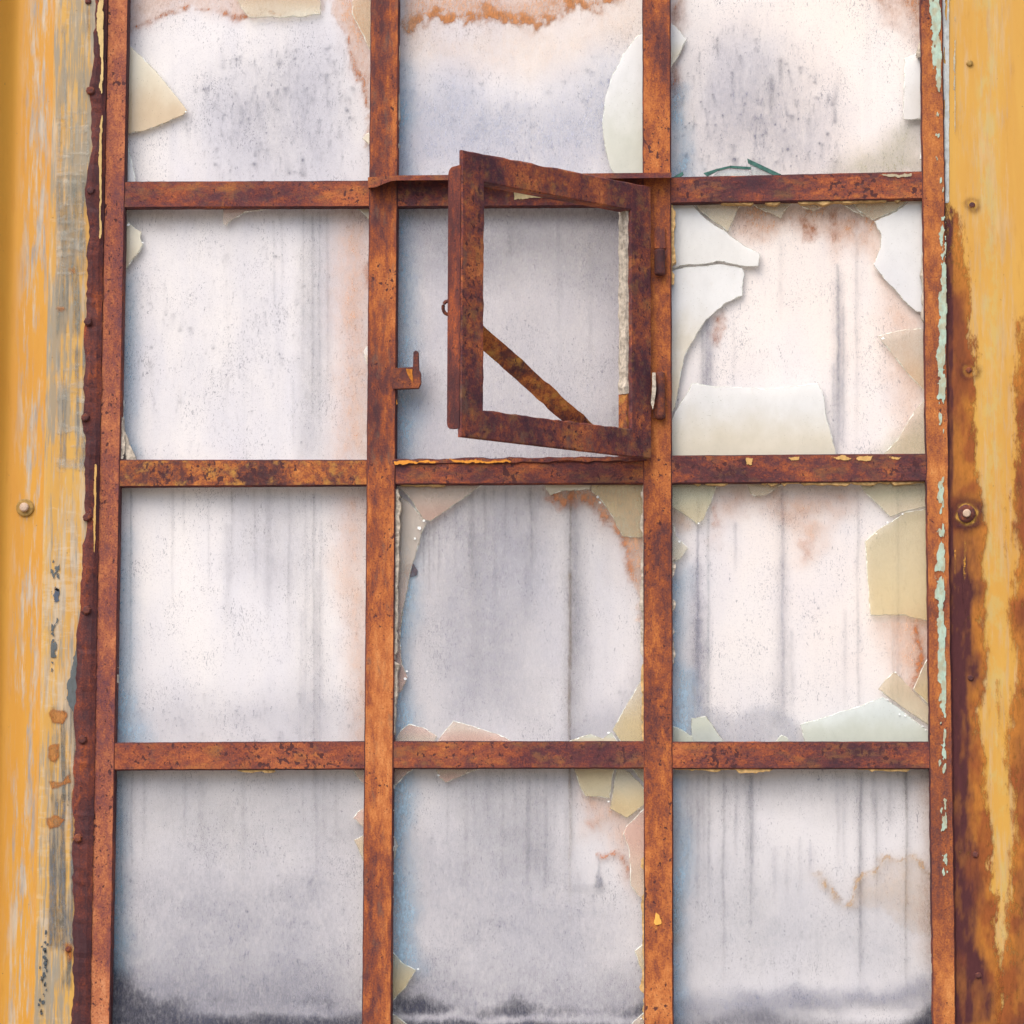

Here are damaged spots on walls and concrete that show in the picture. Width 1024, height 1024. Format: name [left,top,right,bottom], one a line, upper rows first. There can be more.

peeling [96,0,104,94]
rust [402,0,613,33]
peeling [929,0,956,203]
peeling [87,115,103,239]
peeling [936,216,947,433]
rust [619,394,629,428]
rust [552,490,641,582]
peeling [935,476,946,774]
rust [945,203,1024,1024]
rust [49,709,67,724]
water stain [112,962,362,1024]
water stain [910,1008,932,1024]